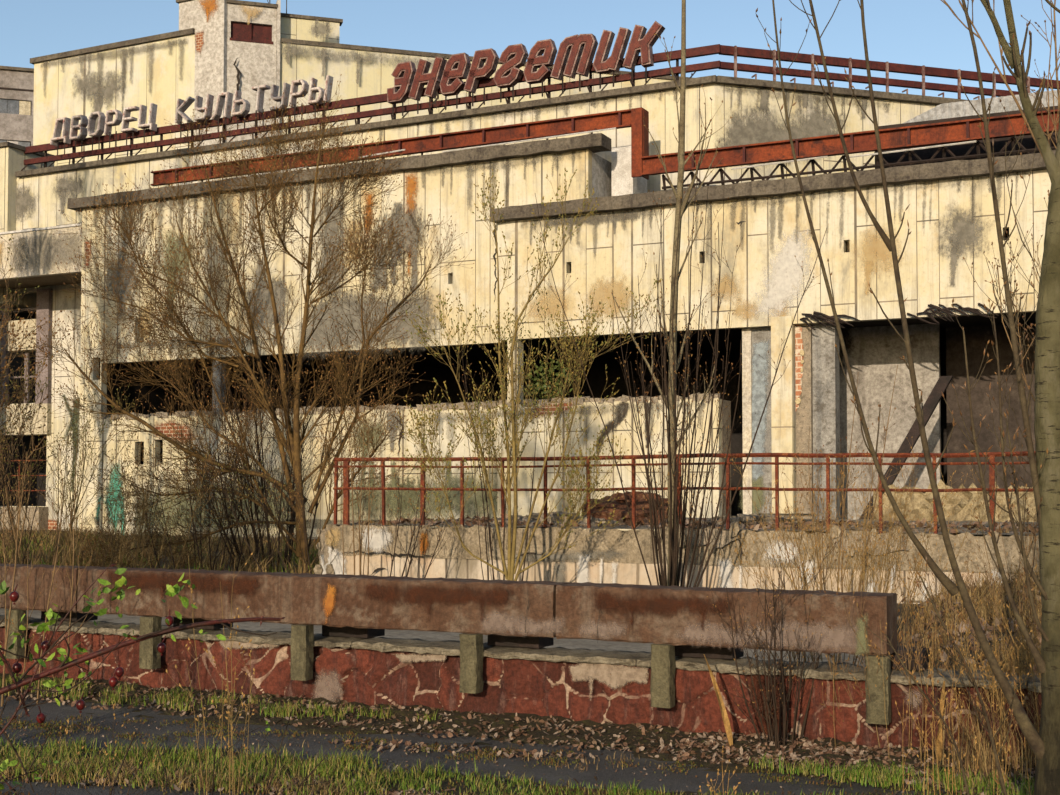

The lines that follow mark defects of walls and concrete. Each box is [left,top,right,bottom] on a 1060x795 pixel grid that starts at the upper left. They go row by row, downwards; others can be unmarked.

leakage [73,57,126,129]
crack [233,58,241,91]
leakage [718,88,843,147]
corrosion [406,172,418,214]
leakage [242,260,291,345]
leakage [300,200,438,353]
leakage [938,209,984,286]
corrosion [324,586,335,616]
spalling [569,663,648,697]